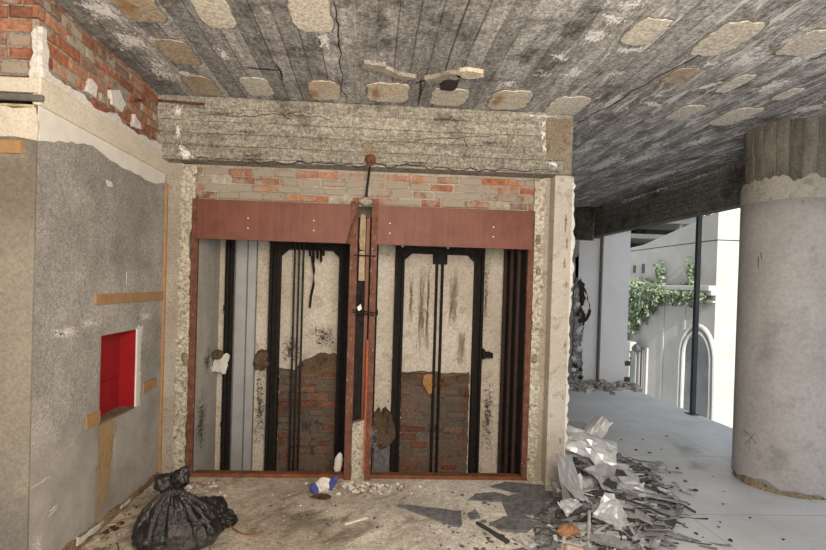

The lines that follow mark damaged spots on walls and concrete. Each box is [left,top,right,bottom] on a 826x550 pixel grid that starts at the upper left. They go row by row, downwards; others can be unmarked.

spalling [189,0,239,29]
spalling [286,0,336,34]
spalling [619,14,676,46]
spalling [688,18,770,56]
spalling [771,27,826,57]
flaking render [0,0,169,152]
crack [200,2,347,123]
spalling [365,81,411,102]
spalling [484,88,535,110]
spalling [559,178,591,455]